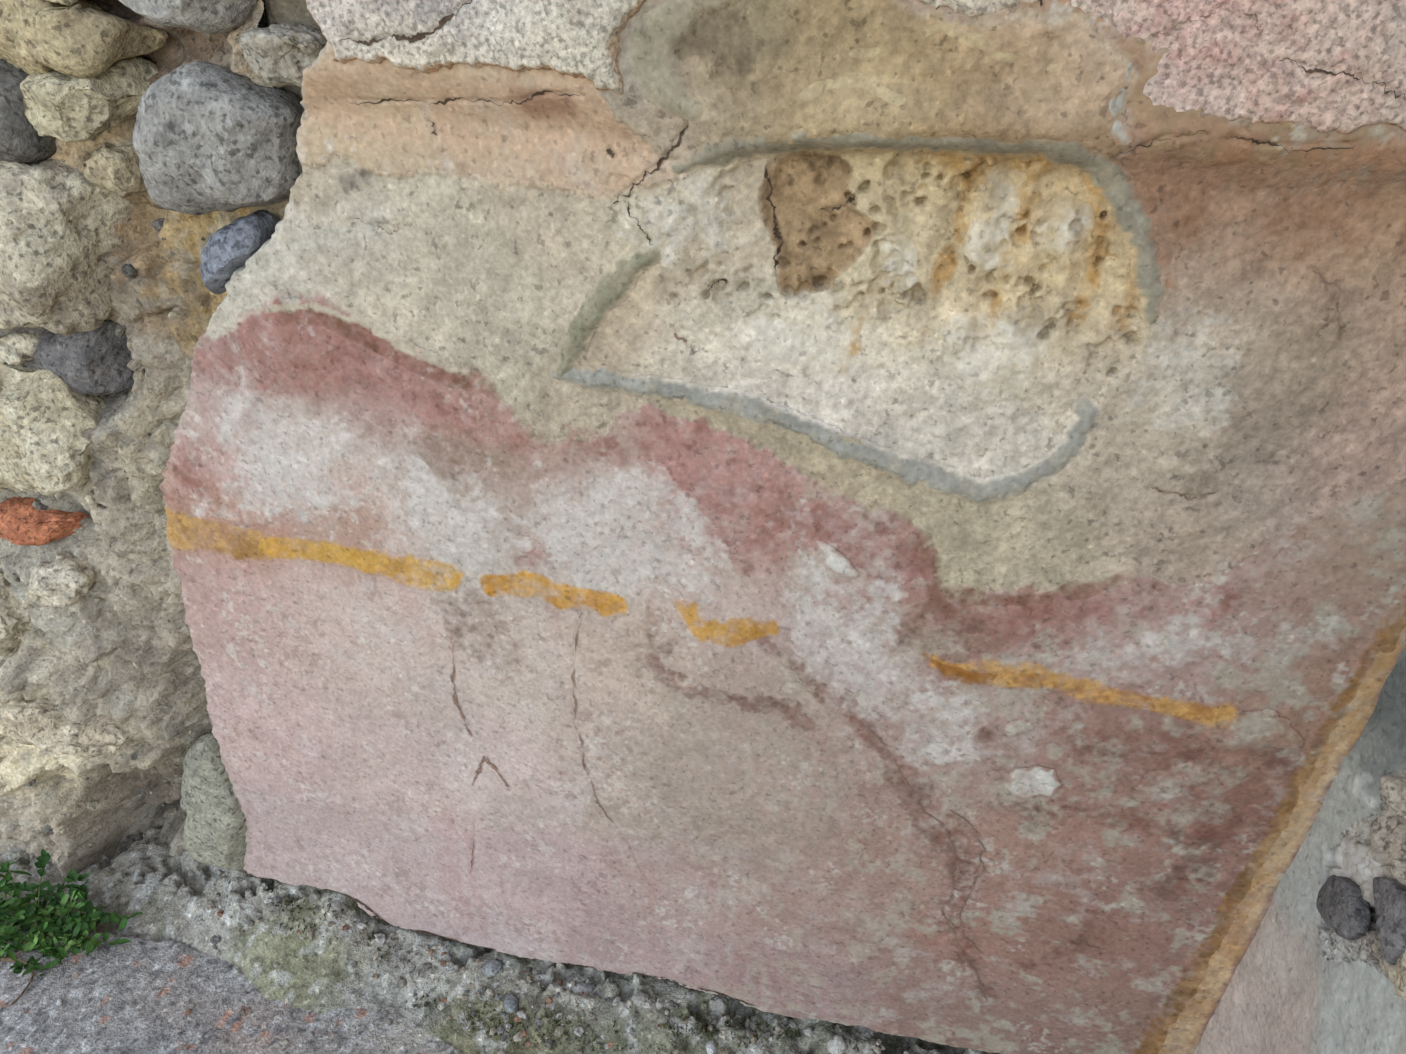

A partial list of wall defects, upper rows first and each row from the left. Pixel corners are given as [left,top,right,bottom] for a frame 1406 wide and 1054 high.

crack [341,0,472,46]
peeling [192,0,1406,659]
peeling [159,426,220,511]
crack [450,644,510,791]